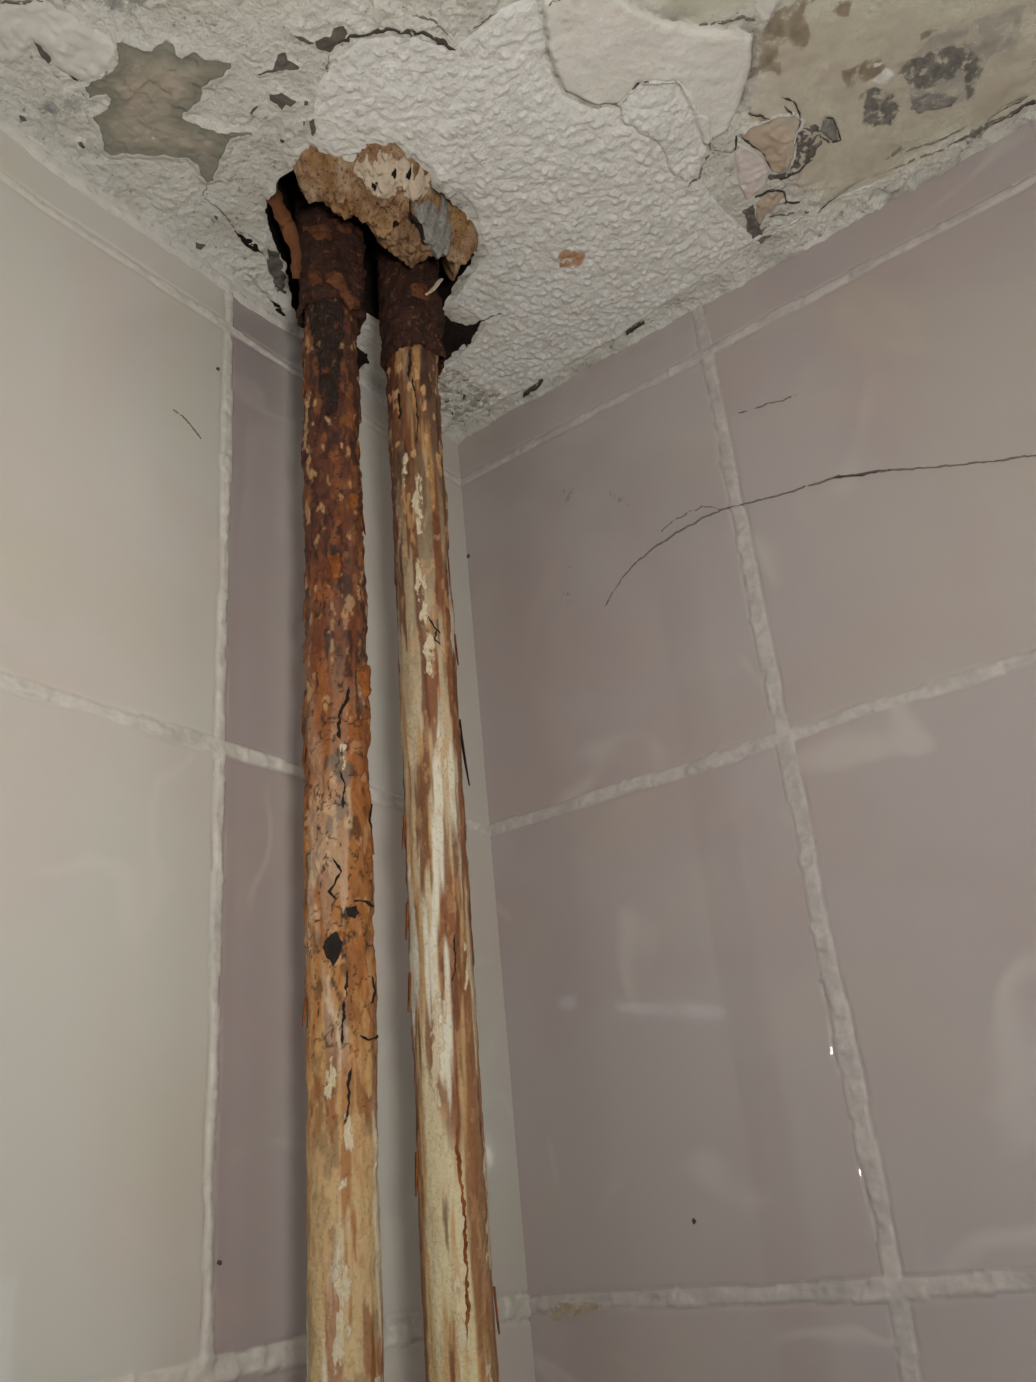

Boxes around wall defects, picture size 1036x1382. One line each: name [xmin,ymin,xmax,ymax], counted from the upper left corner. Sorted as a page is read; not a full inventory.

peeling [0,0,351,319]
spalling [372,167,411,191]
peeling [613,80,713,187]
water stain [749,0,1036,187]
rust [307,269,360,311]
rust [301,218,367,278]
hole [362,222,379,320]
flaking render [437,254,502,360]
crack [738,396,791,413]
crack [605,455,1036,606]
rust [356,664,372,698]
rust [459,719,470,786]